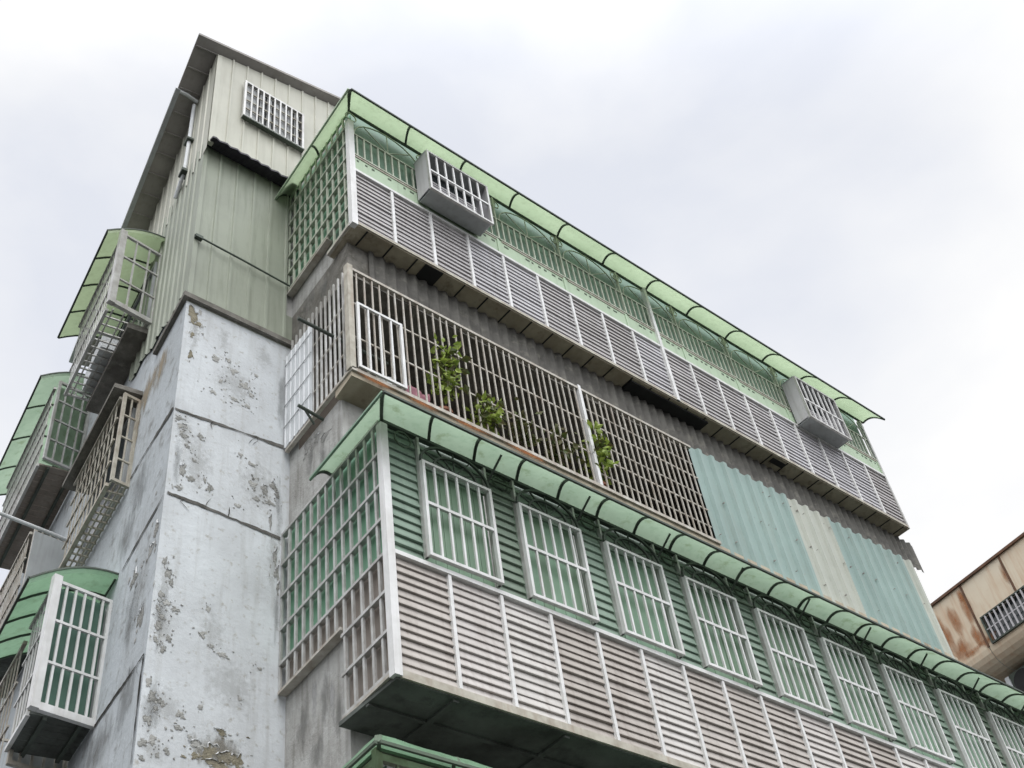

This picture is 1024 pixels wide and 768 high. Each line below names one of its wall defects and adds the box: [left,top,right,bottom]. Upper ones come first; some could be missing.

peeling [188,304,258,414]
peeling [169,415,214,495]
peeling [237,440,282,596]
peeling [128,519,183,653]
rust [939,593,992,656]
flaking render [137,676,253,768]